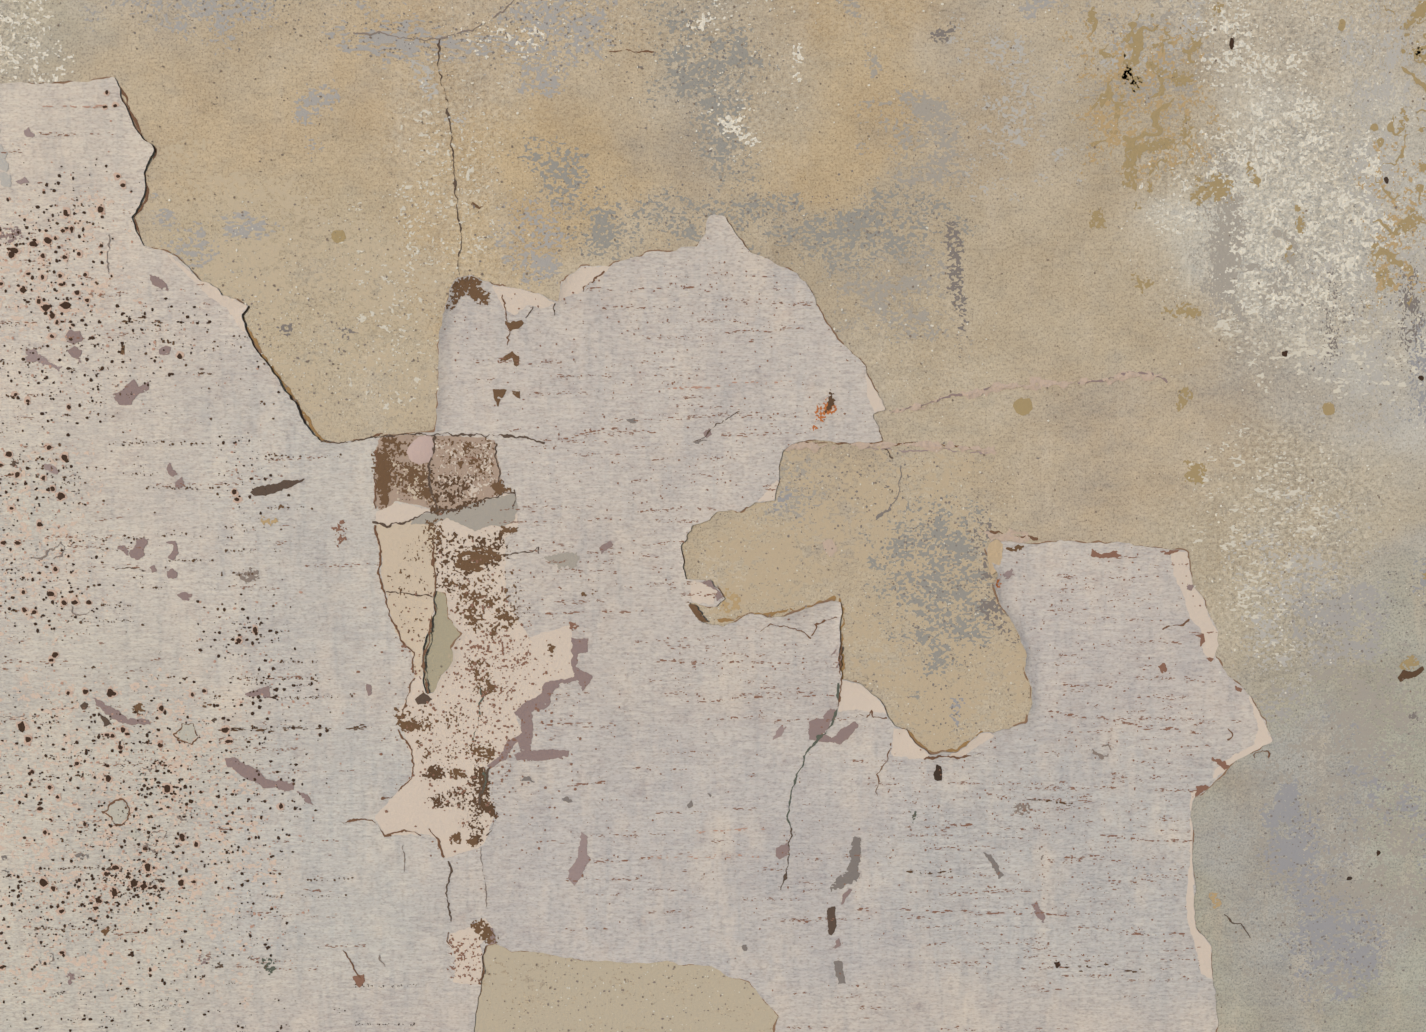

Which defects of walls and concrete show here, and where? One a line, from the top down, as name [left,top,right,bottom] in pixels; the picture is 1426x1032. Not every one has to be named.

crack [353,0,514,272]
corrosion [1273,205,1316,289]
peeling [407,474,421,500]
spalling [414,460,432,488]
spalling [435,486,475,509]
corrosion [305,218,1240,998]
peeling [926,556,988,613]
peeling [415,692,432,705]
peeling [450,784,482,807]
corrosion [447,918,529,1015]